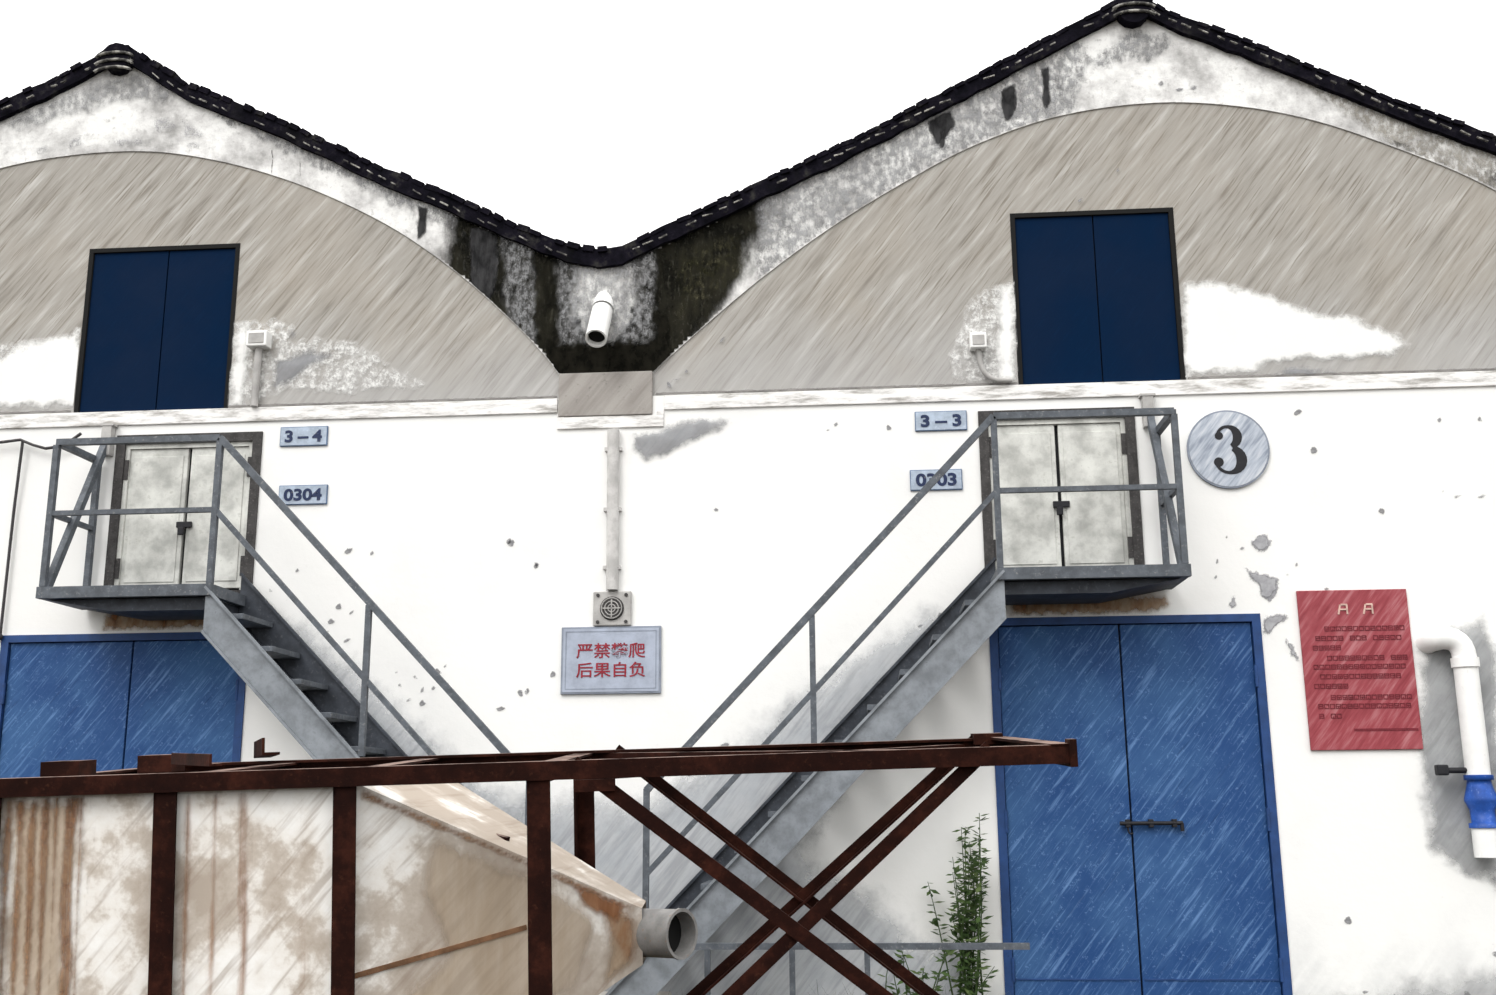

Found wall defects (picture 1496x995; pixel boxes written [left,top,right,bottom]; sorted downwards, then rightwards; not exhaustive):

water stain [218,31,1168,374]
peeling [0,328,81,408]
peeling [229,320,422,405]
peeling [950,284,1017,380]
peeling [1183,282,1403,376]
water stain [635,419,725,460]